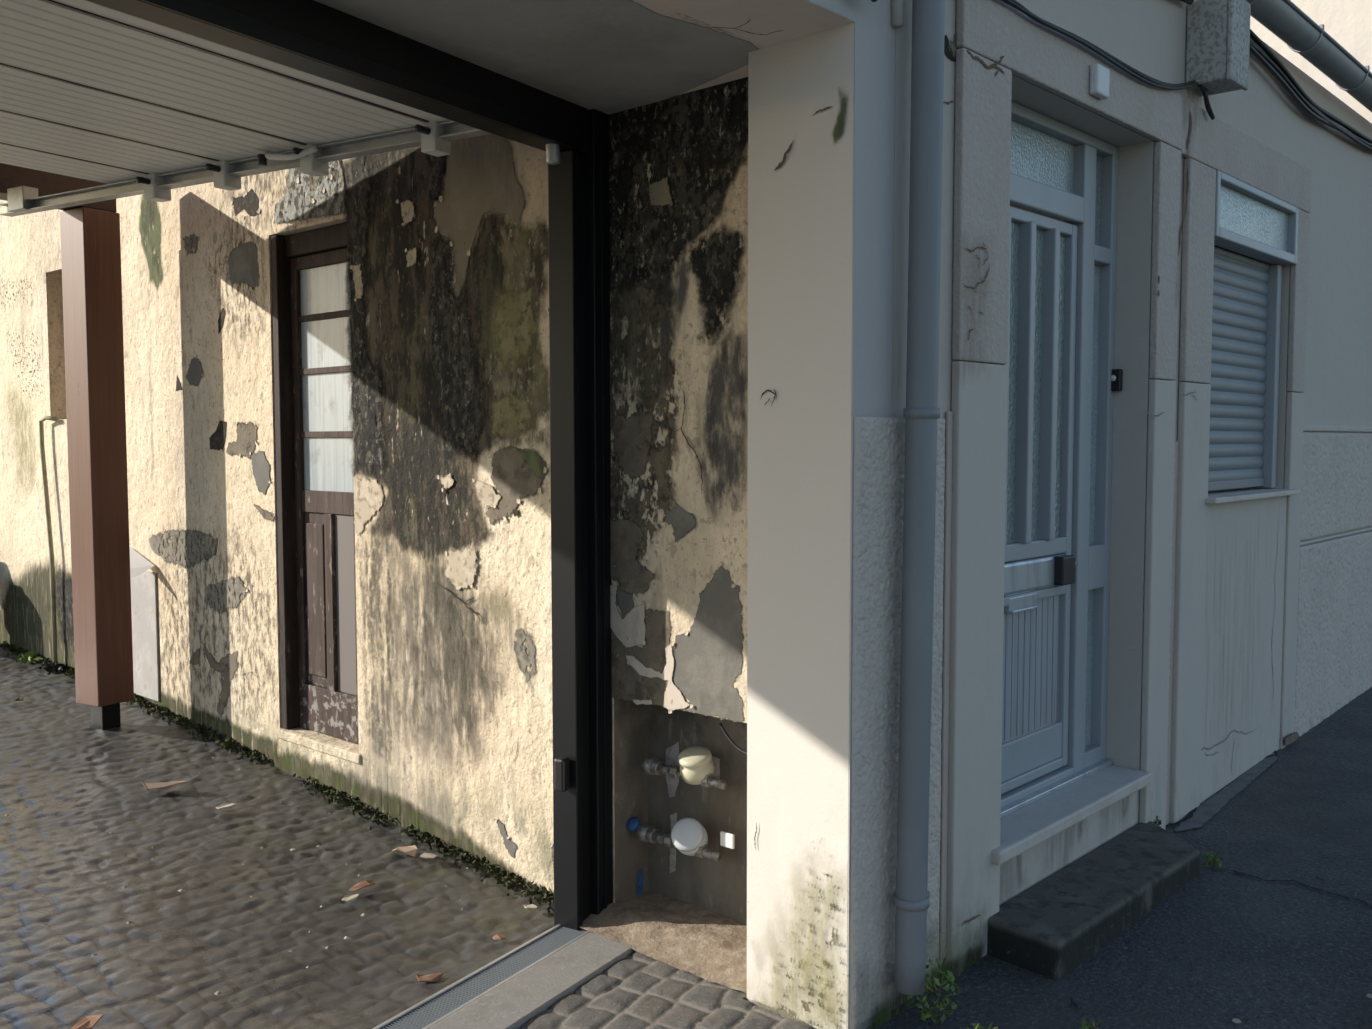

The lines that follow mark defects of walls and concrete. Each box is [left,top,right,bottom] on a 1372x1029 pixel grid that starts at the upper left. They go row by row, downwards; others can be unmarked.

peeling [314,0,759,115]
crack [967,50,1005,76]
damp [609,77,748,511]
flaking render [130,529,217,579]
flaking render [207,419,274,521]
damp [343,146,504,758]
flaking render [472,445,547,524]
flaking render [609,283,744,722]
damp [513,628,536,682]
crack [1201,613,1275,771]
damp [353,784,452,844]
damp [773,873,843,1029]